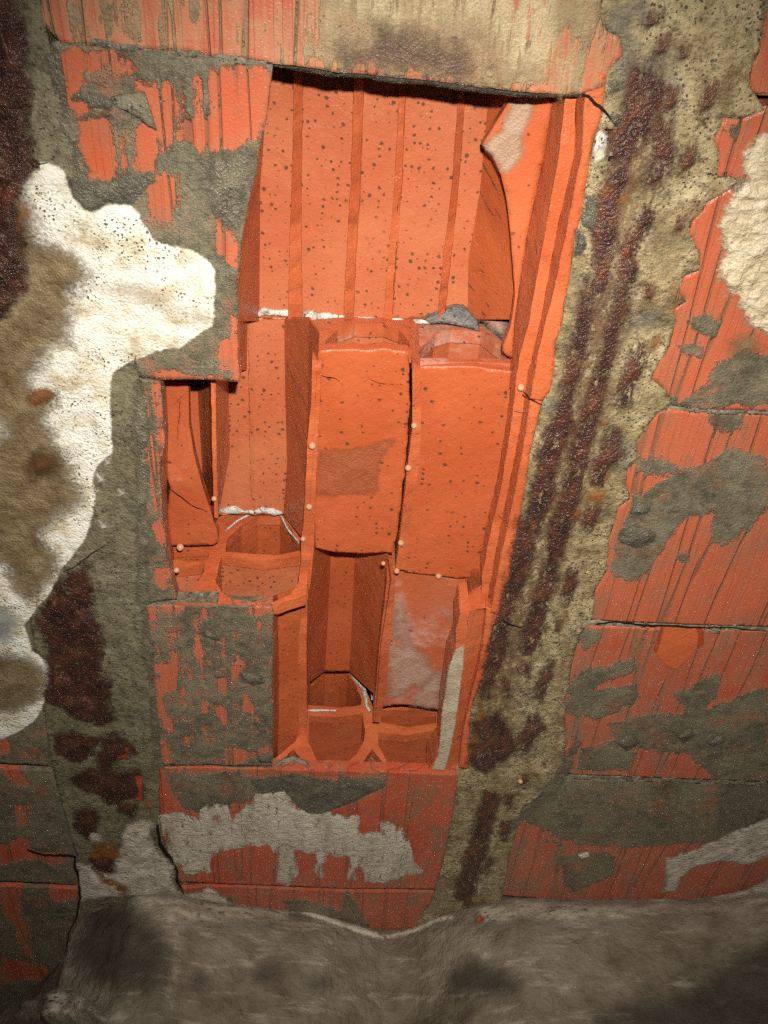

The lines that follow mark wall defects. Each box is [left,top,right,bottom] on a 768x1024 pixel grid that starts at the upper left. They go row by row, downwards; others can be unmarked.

spalling [207,147,254,230]
spalling [574,196,598,256]
spalling [593,131,608,163]
water stain [717,133,768,355]
water stain [0,162,216,739]
corrosion [465,67,700,774]
spalling [653,627,704,669]
crack [595,621,767,631]
corrosion [35,561,151,895]
crack [156,824,184,894]
water stain [68,791,452,1011]
corrosion [453,776,528,924]